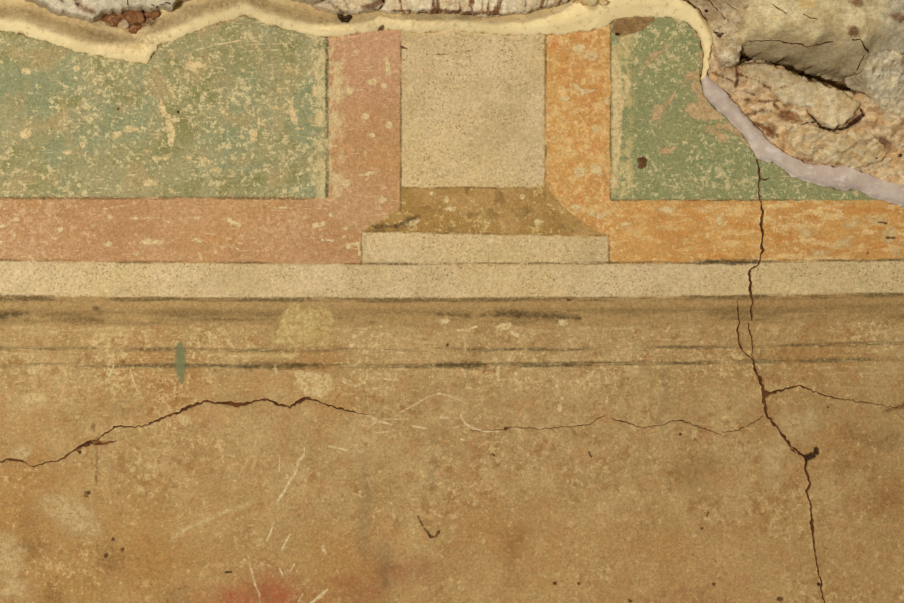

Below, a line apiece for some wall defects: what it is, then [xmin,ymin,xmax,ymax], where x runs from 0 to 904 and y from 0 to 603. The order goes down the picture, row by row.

crack [0,154,898,603]
peeling [812,216,900,257]